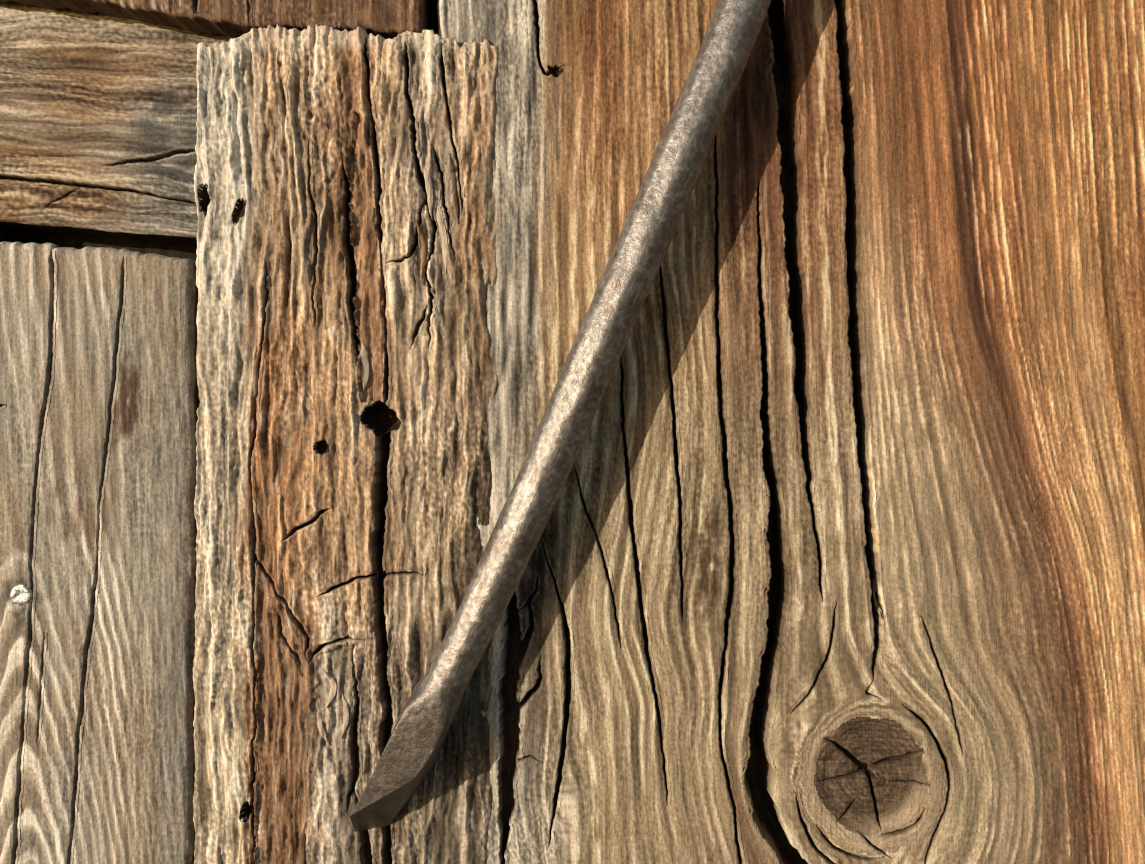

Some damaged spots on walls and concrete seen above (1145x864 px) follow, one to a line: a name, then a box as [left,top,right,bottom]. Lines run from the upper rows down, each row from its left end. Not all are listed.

crack [0,146,197,211]
crack [189,0,200,13]
crack [244,0,252,23]
crack [530,0,565,79]
crack [245,36,466,864]
crack [494,537,574,864]
crack [572,357,671,806]
crack [657,261,687,622]
crack [711,0,966,864]